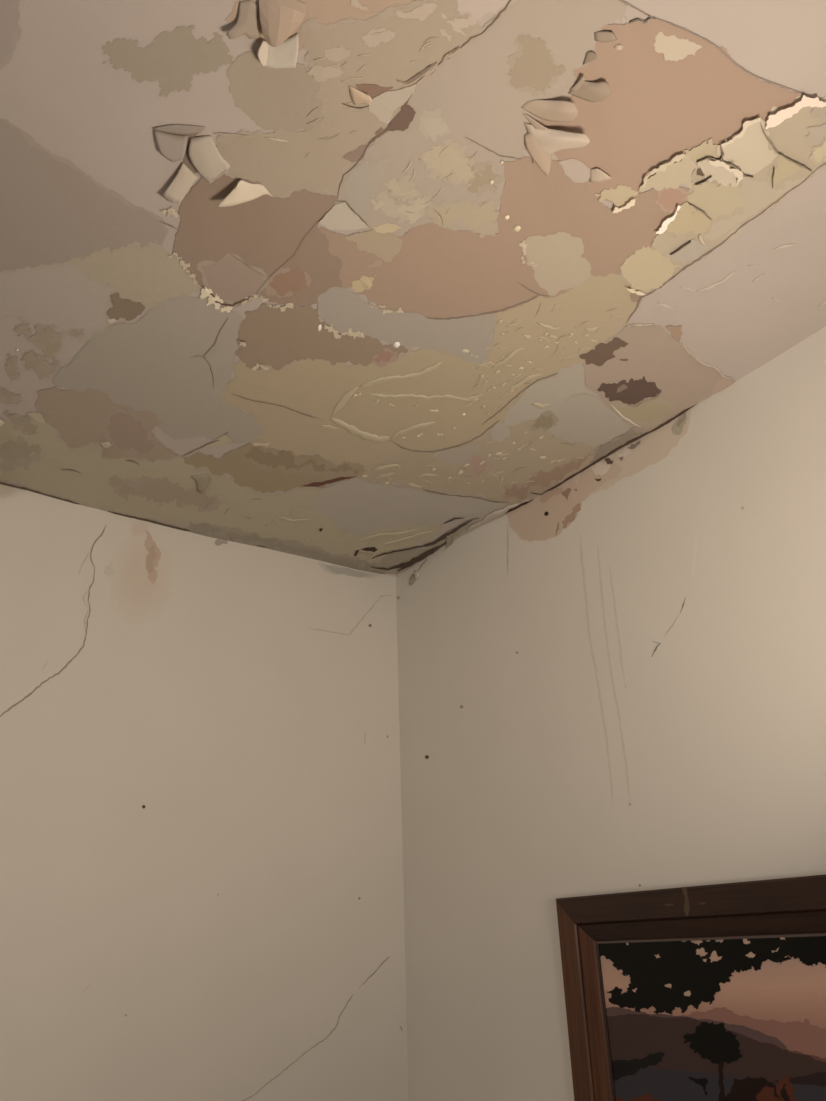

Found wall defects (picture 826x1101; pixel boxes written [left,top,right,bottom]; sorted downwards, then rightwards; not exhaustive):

crack [337,0,517,228]
crack [191,222,317,418]
flaking render [53,0,826,585]
crack [428,281,546,320]
damp [531,410,559,431]
damp [502,427,646,503]
crack [0,526,106,717]
crack [241,956,390,1101]